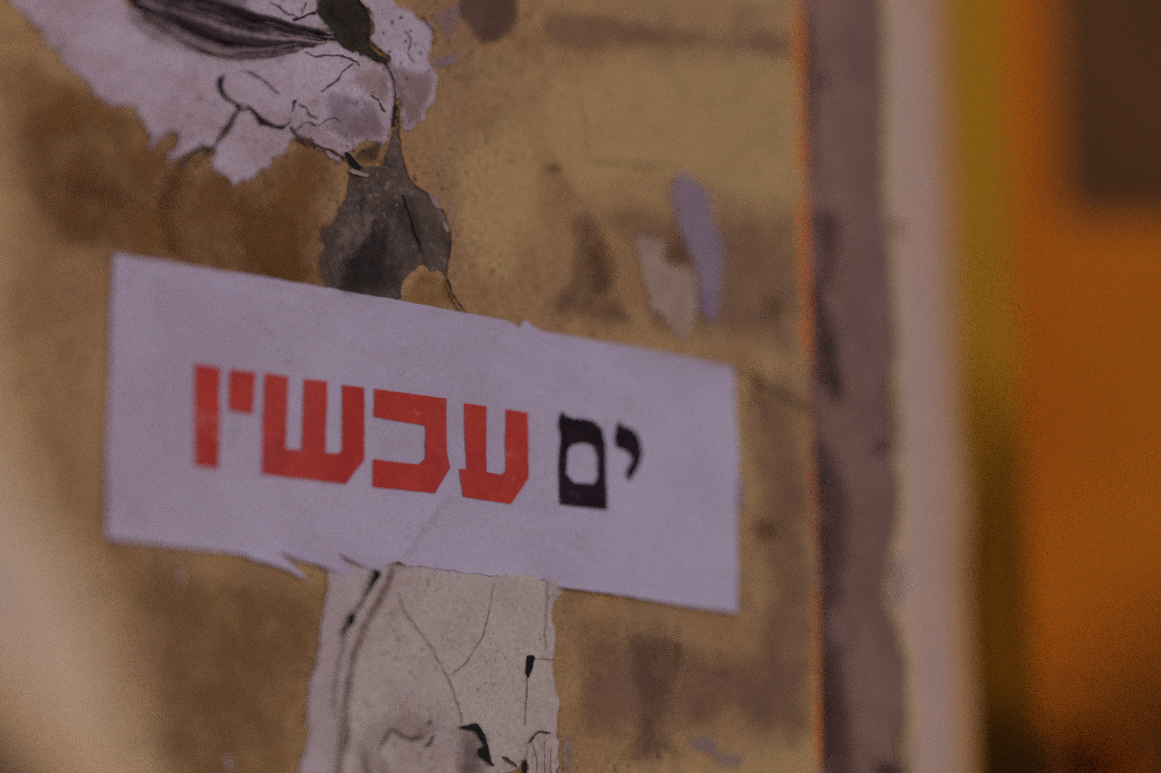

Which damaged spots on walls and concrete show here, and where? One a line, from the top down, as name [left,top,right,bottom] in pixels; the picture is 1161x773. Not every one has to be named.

flaking render [11,0,463,310]
flaking render [300,559,563,773]